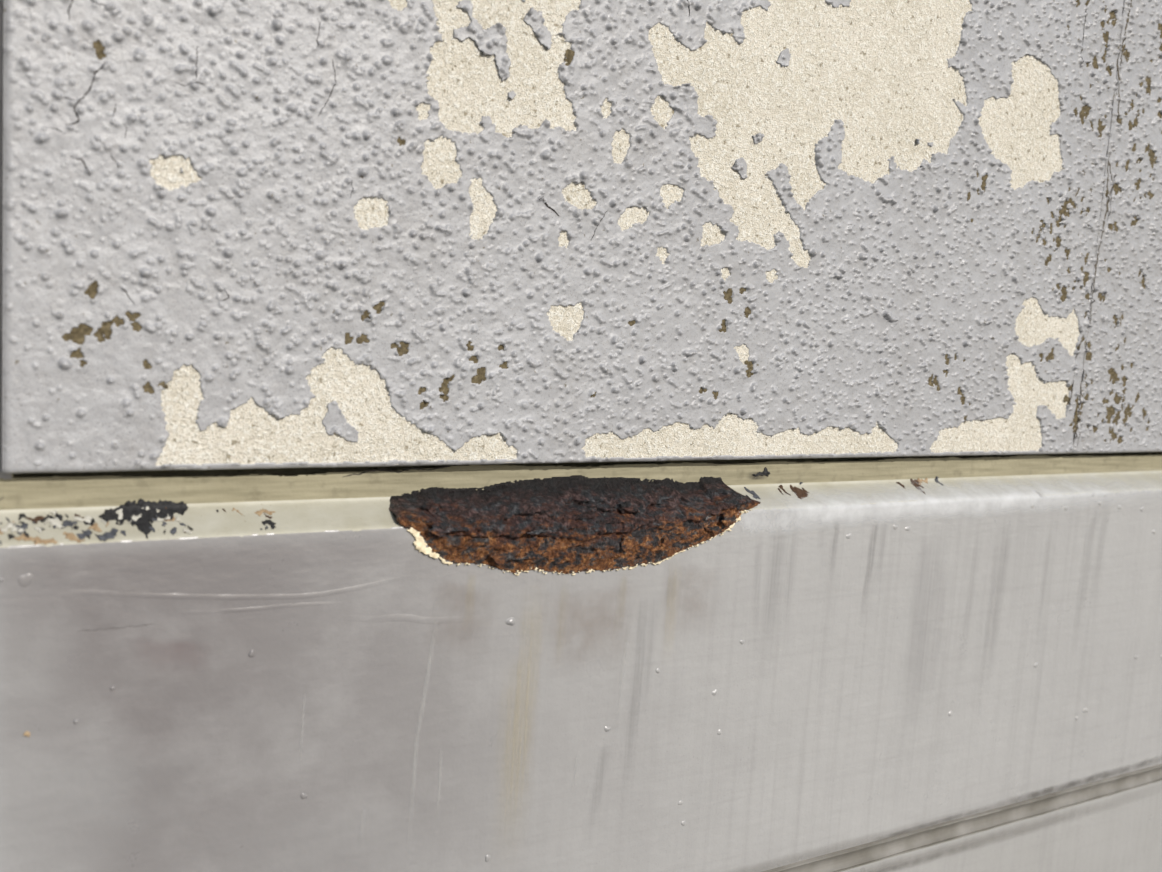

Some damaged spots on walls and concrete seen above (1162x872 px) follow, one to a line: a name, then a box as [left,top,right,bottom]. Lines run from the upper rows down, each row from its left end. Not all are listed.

spalling [1086,6,1117,76]
crack [44,62,127,176]
peeling [415,0,581,241]
peeling [648,0,972,268]
spalling [84,281,99,299]
spalling [62,311,142,367]
peeling [143,301,517,469]
rust [389,467,770,576]
peeling [582,413,898,458]
rust [778,482,809,500]
peeling [928,55,1162,453]
crack [1070,0,1132,441]